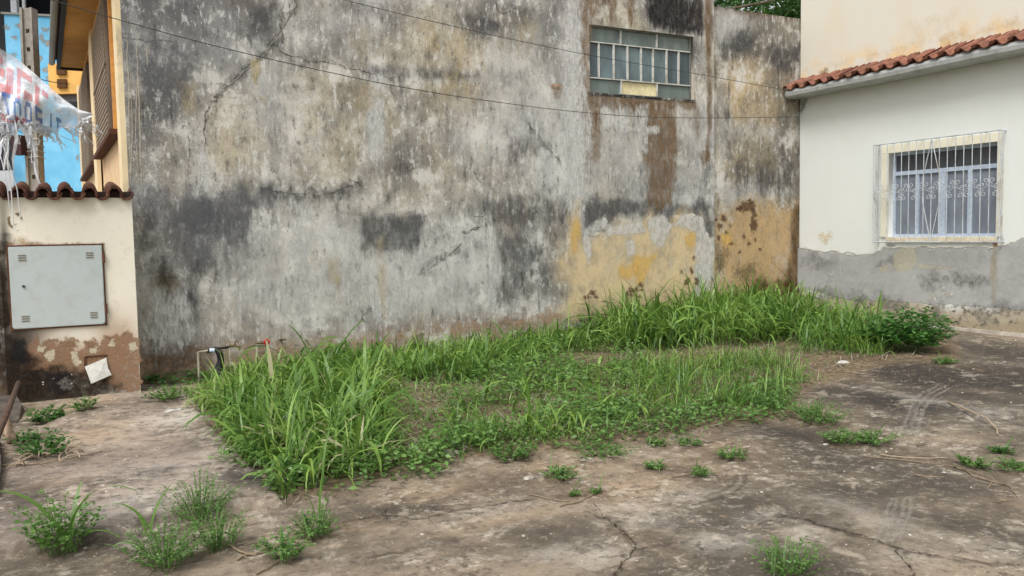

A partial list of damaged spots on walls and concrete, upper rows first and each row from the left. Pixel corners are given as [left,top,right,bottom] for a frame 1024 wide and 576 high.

peeling [450,199,1024,337]